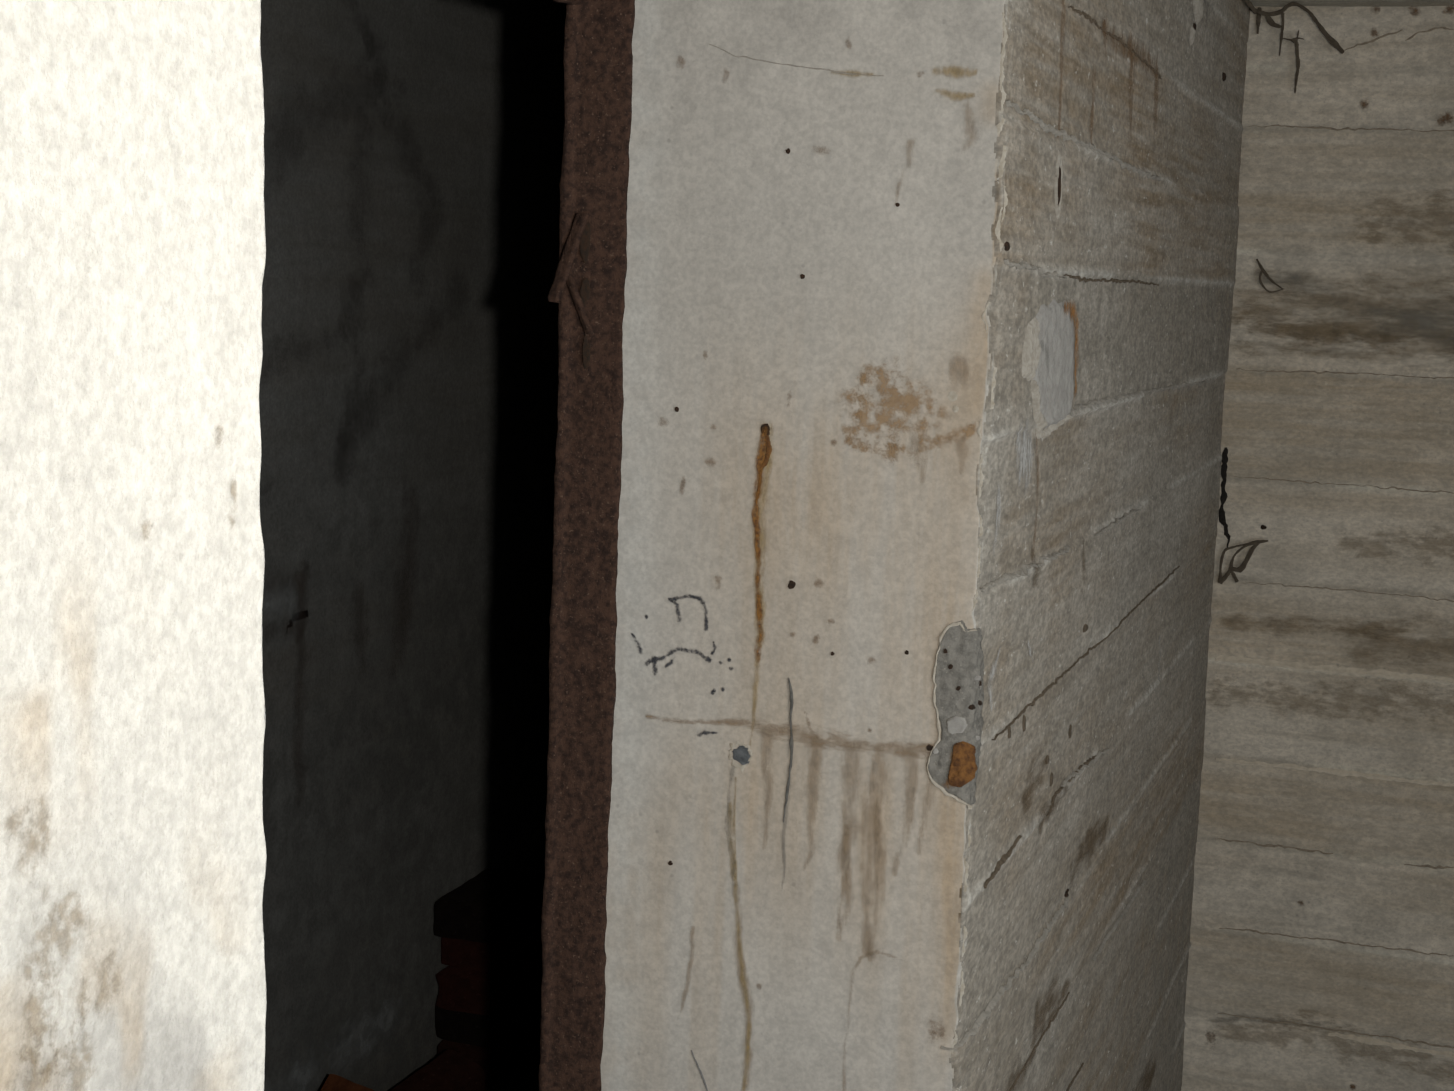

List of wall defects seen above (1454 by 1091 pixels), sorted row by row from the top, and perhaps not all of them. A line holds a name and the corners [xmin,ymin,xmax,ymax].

flaking render [995,13,1008,252]
spalling [1022,299,1079,439]
corrosion [752,423,772,657]
flaking render [926,367,997,809]
crack [1219,447,1454,548]